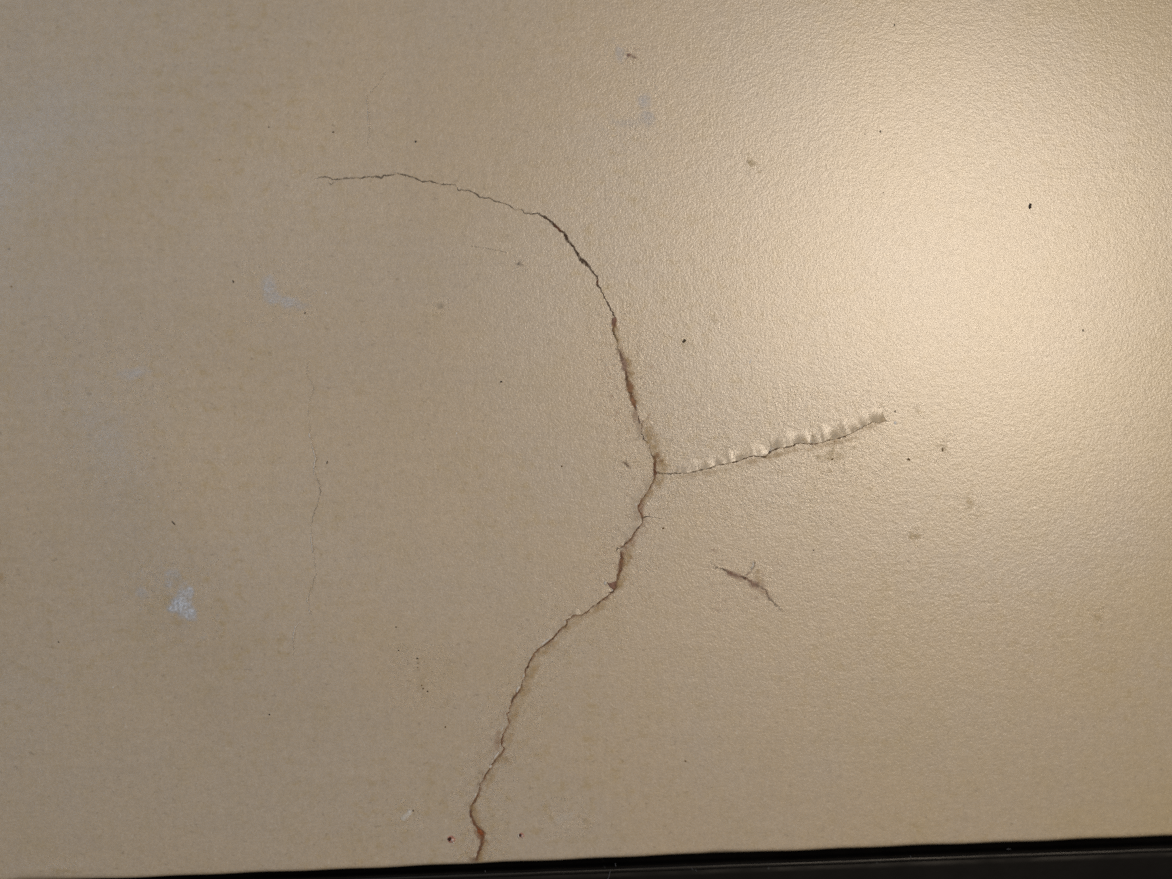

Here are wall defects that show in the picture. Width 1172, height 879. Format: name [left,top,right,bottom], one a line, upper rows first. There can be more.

crack [319,168,886,860]